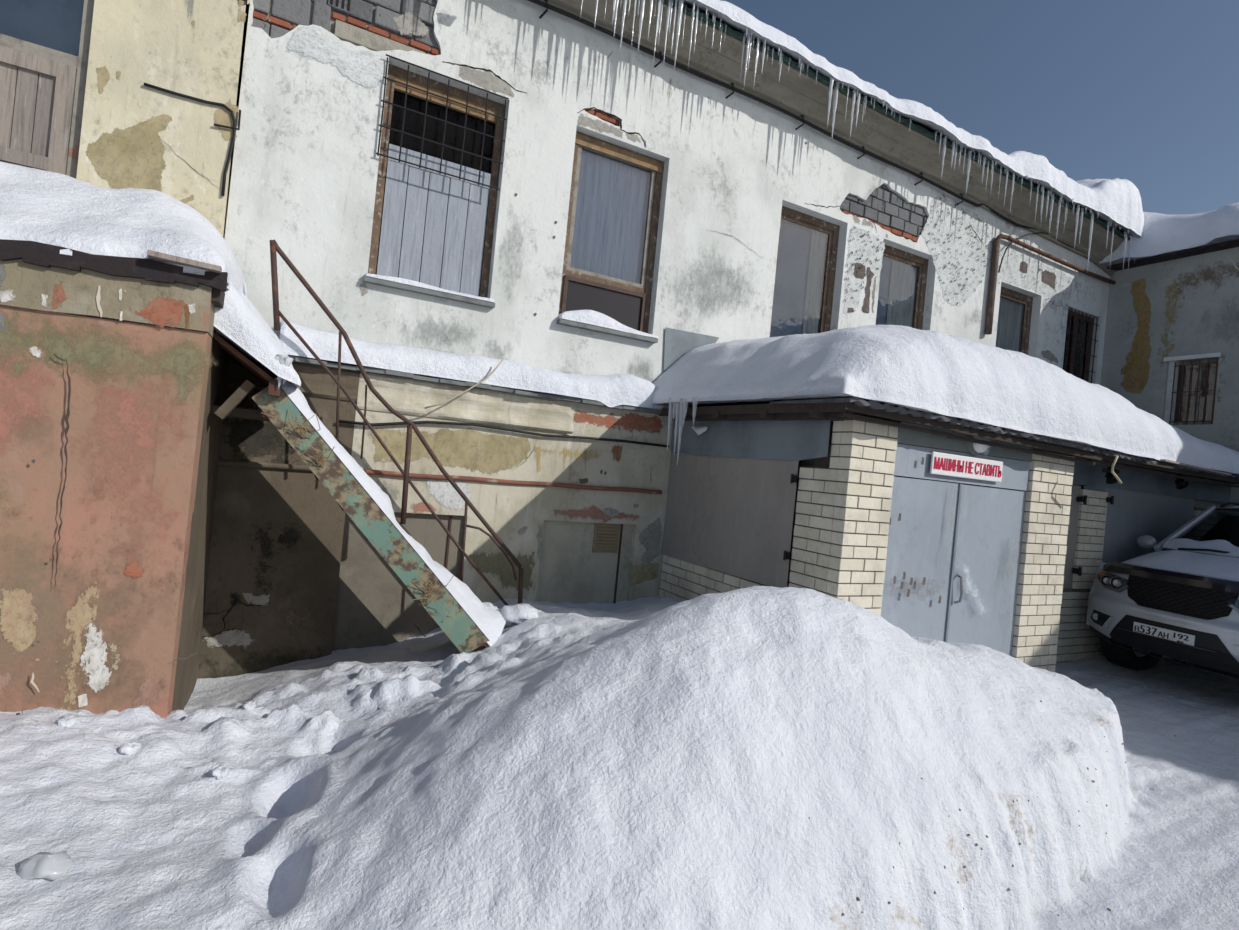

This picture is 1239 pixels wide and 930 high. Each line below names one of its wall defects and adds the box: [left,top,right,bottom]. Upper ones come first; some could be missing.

flaking render [237,0,526,97]
peeling [86,114,172,192]
flaking render [578,107,645,143]
peeling [0,264,15,302]
flaking render [136,296,195,330]
flaking render [804,184,1074,314]
peeling [1120,278,1185,394]
flaking render [573,412,663,434]
crack [53,353,71,588]
flaking render [0,588,40,661]
peeling [55,581,120,711]
flaking render [203,628,255,650]